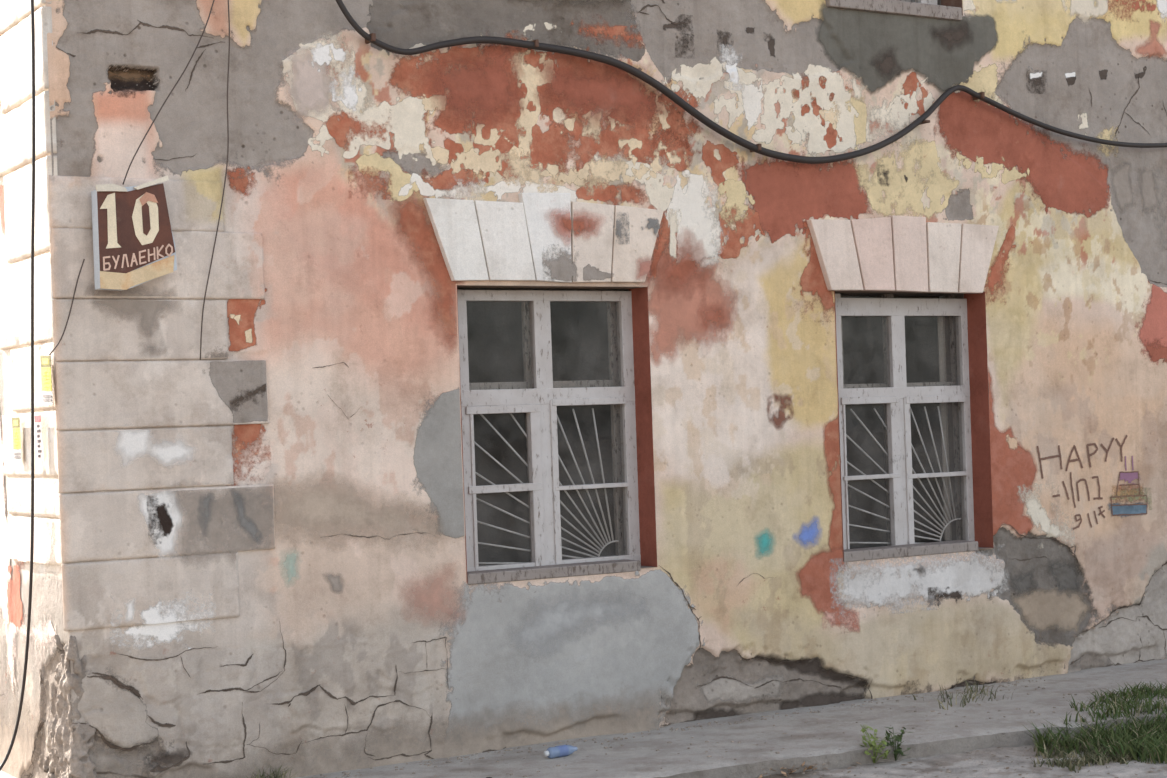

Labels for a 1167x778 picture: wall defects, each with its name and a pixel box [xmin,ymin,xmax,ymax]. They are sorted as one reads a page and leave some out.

flaking render [50,0,1167,362]
flaking render [0,422,186,778]
flaking render [205,288,269,486]
peeling [768,395,793,428]
peeling [824,416,843,551]
peeling [928,587,961,606]
flaking render [977,372,1167,673]
crack [26,621,449,778]
flaking render [661,648,867,725]